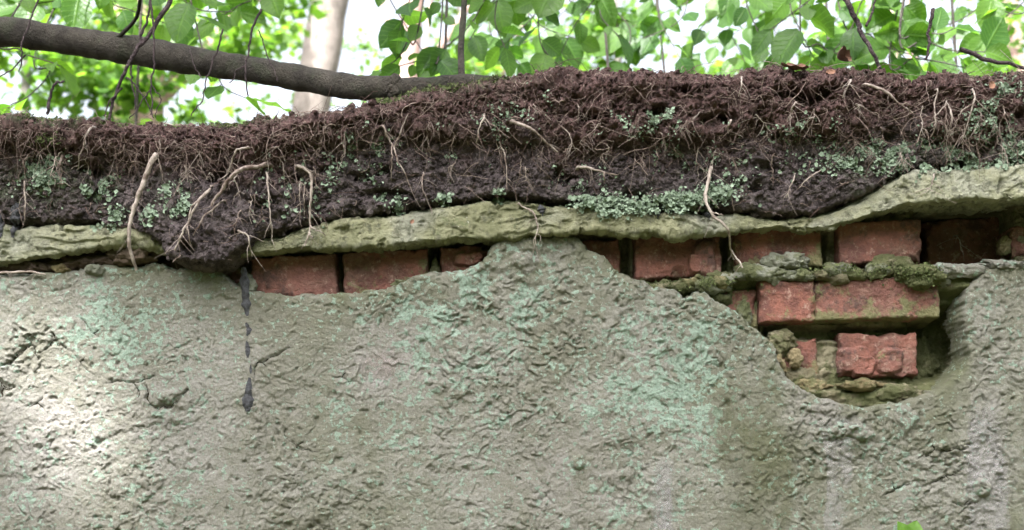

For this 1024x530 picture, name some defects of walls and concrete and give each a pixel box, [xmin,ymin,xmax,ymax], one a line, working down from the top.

peeling [0,247,185,276]
peeling [238,252,320,291]
peeling [337,251,356,293]
peeling [412,243,491,273]
peeling [572,234,633,279]
peeling [646,206,1024,408]
damp [239,267,254,412]